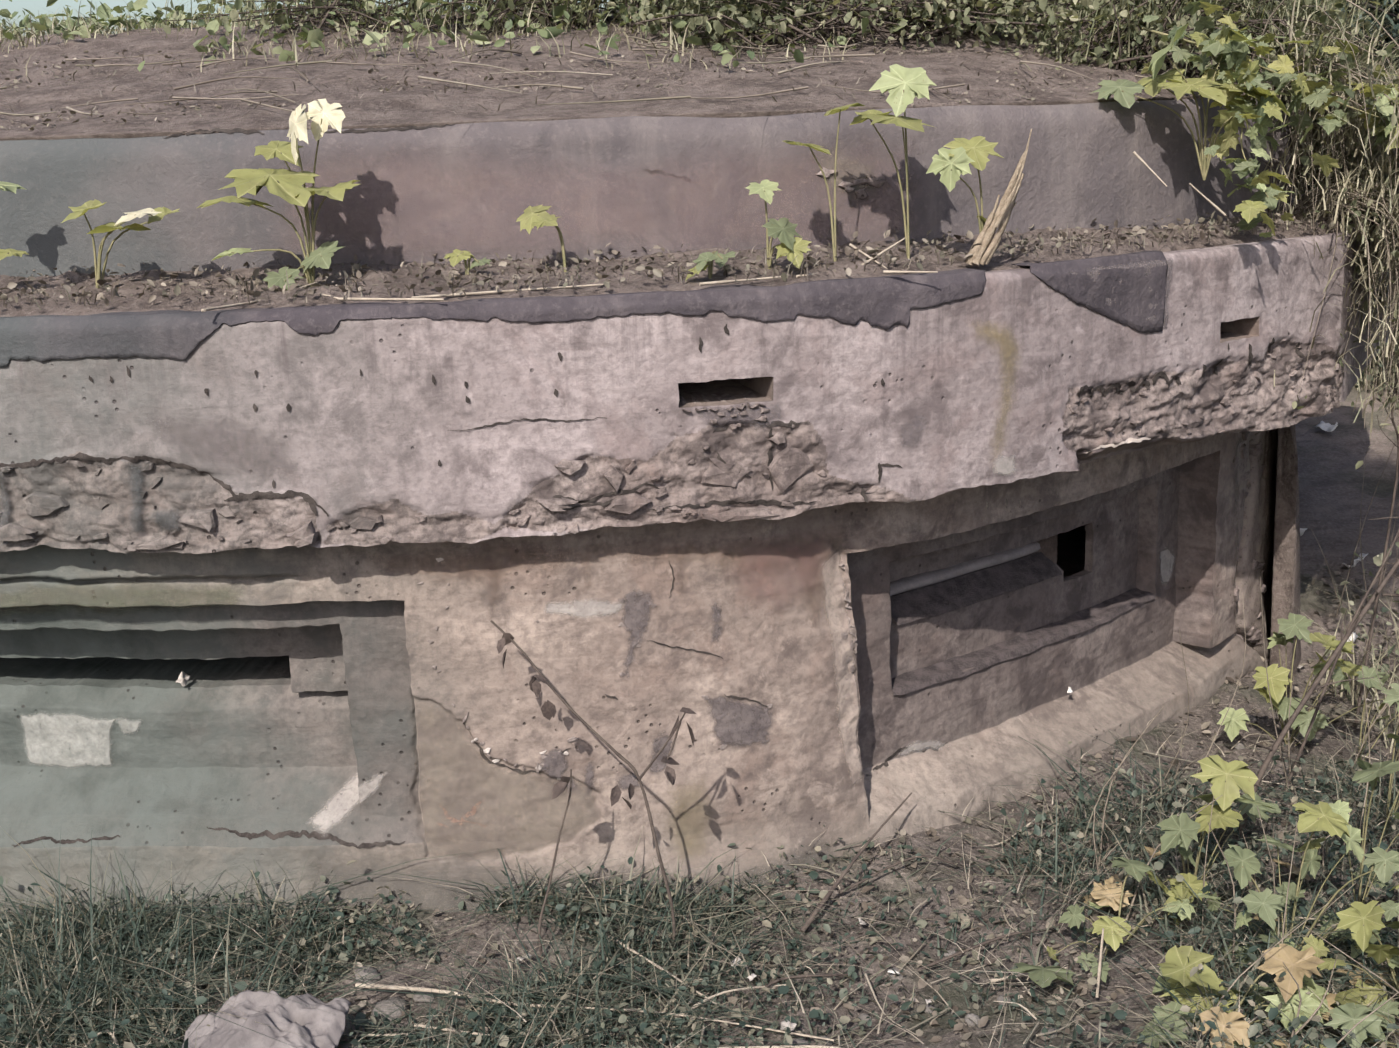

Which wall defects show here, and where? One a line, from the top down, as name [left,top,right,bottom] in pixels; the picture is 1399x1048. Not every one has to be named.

spalling [0,390,917,554]
spalling [1062,337,1345,647]
crack [12,835,120,847]
crack [207,827,405,848]